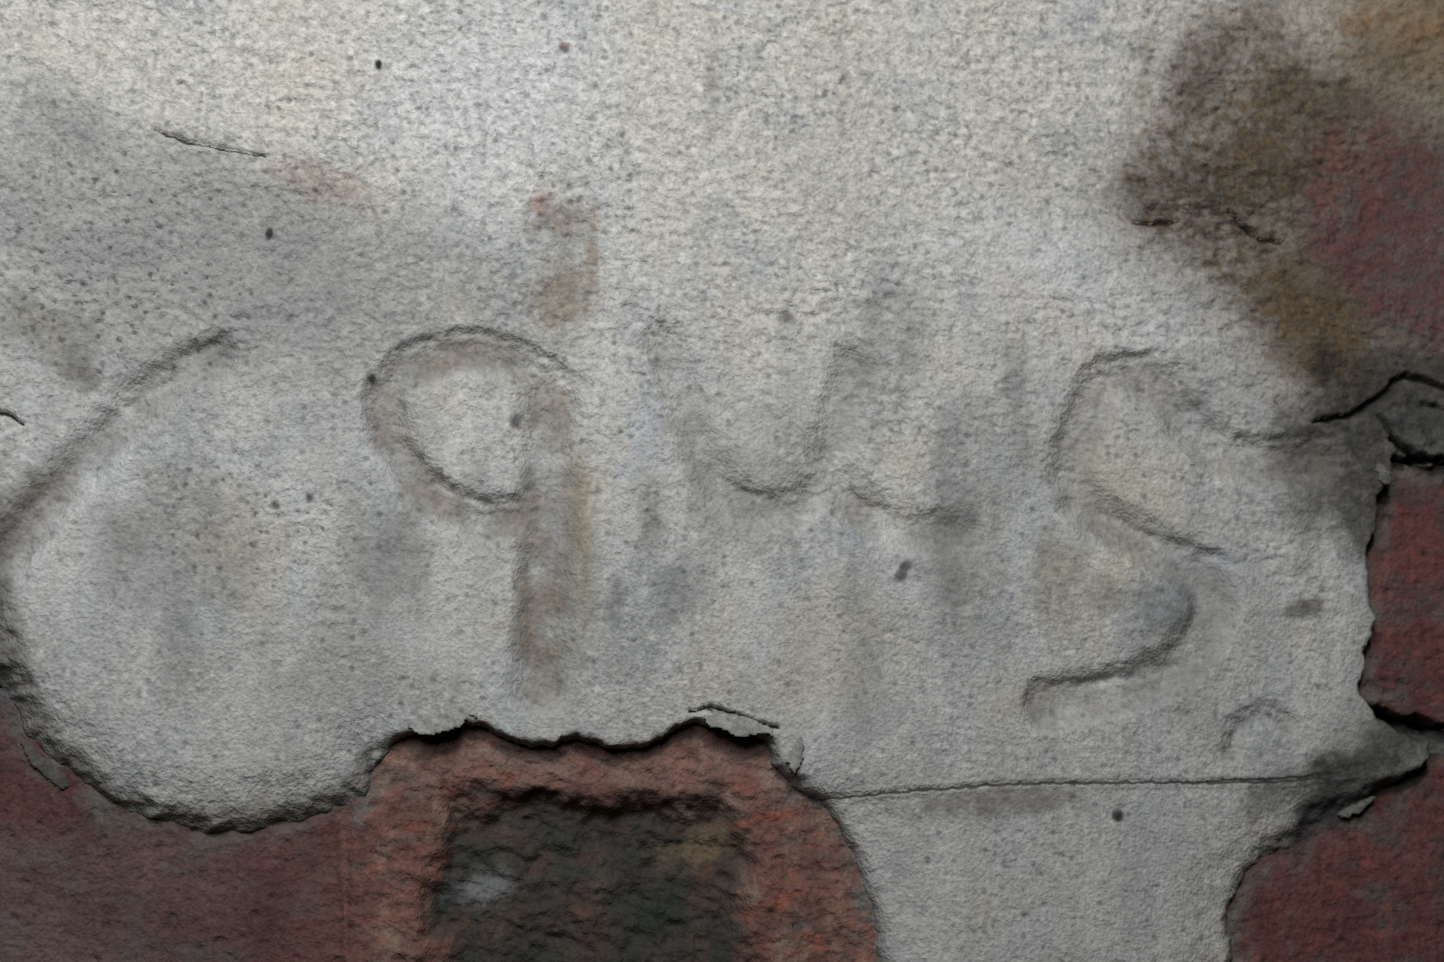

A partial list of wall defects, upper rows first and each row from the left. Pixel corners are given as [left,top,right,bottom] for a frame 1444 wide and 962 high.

damp [1134,33,1444,439]
crack [1311,374,1444,465]
flaking render [1358,461,1444,729]
flaking render [328,711,876,962]
crack [801,757,1381,801]
flaking render [1228,752,1444,962]